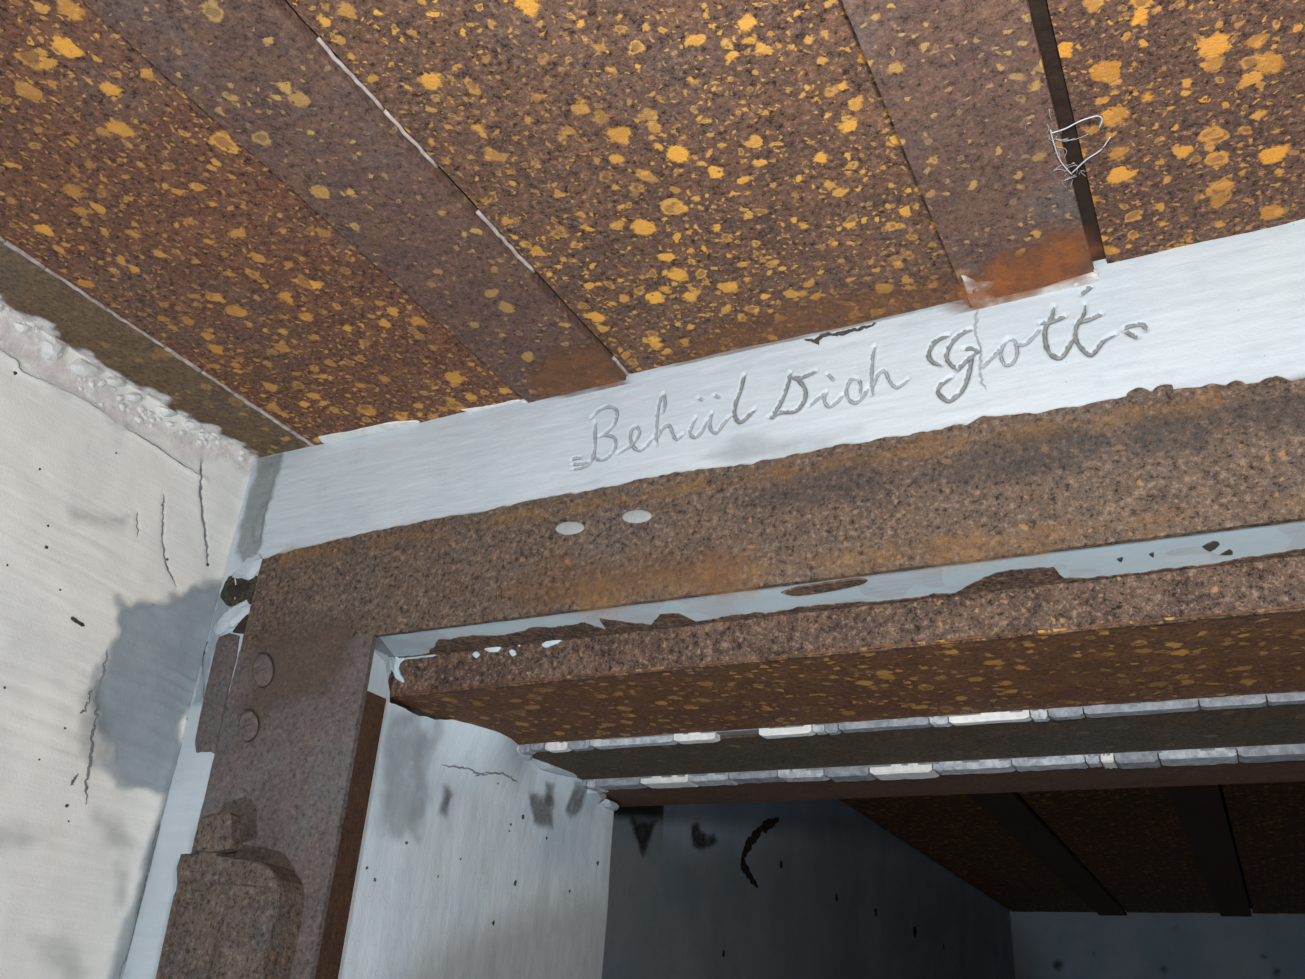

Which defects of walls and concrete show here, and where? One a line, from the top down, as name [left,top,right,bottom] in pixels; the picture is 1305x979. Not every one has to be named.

rust [959,236,1091,310]
rust [531,351,624,395]
flaking render [461,399,527,412]
flaking render [318,420,420,444]
flaking render [1202,541,1233,555]
crack [71,617,85,627]
damp [93,584,228,815]
crack [70,649,108,804]
damp [112,831,157,979]